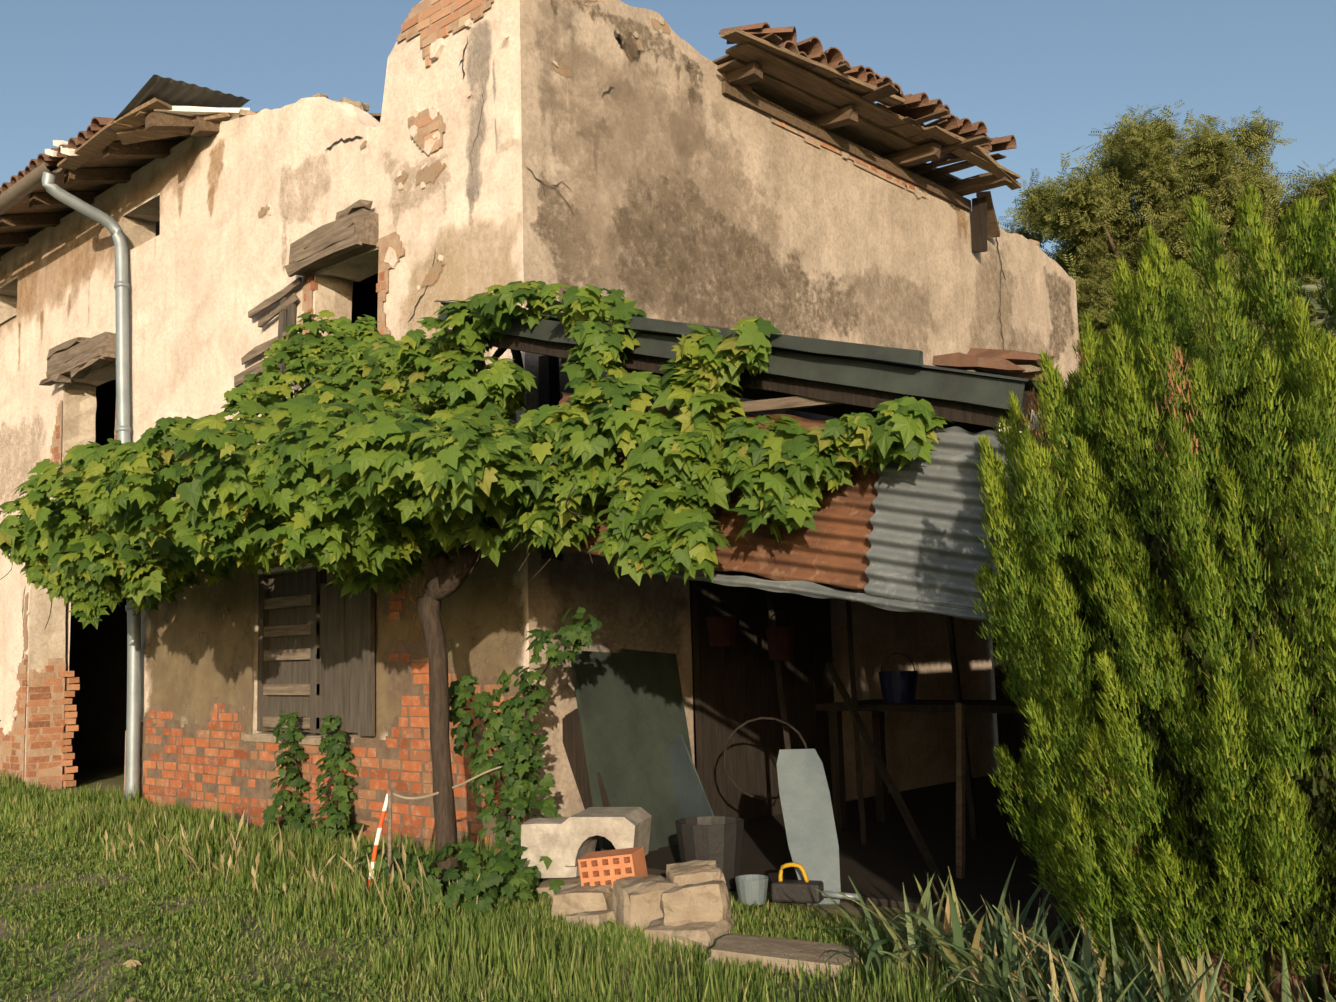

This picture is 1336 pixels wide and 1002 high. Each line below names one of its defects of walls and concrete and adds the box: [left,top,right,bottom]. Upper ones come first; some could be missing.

flaking render [397,0,494,68]
flaking render [395,106,446,190]
leakage [533,0,933,349]
flaking render [376,231,404,343]
crack [996,237,1006,350]
rust [623,402,679,415]
rust [731,414,826,442]
rust [554,494,618,557]
rust [706,465,880,590]
flaking render [0,590,66,790]
flaking render [124,640,435,850]
flaking render [448,667,529,859]